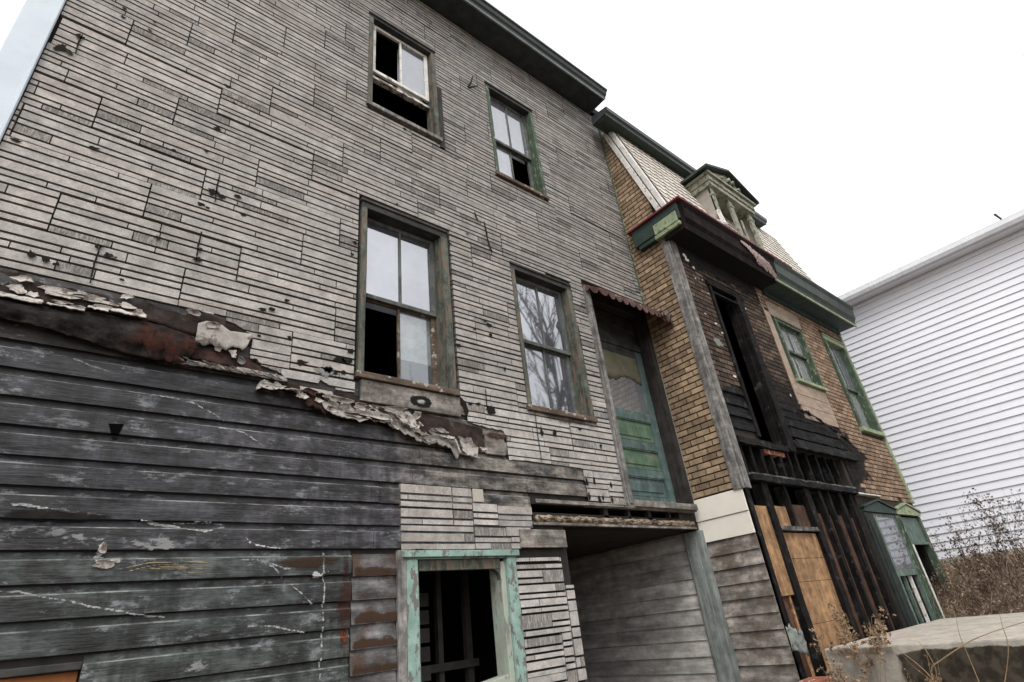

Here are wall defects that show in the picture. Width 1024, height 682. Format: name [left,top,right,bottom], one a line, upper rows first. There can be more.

peeling [0,249,221,335]
peeling [214,345,246,365]
spalling [324,349,354,375]
peeling [258,379,488,458]
spalling [532,515,695,527]
peeling [62,534,121,569]